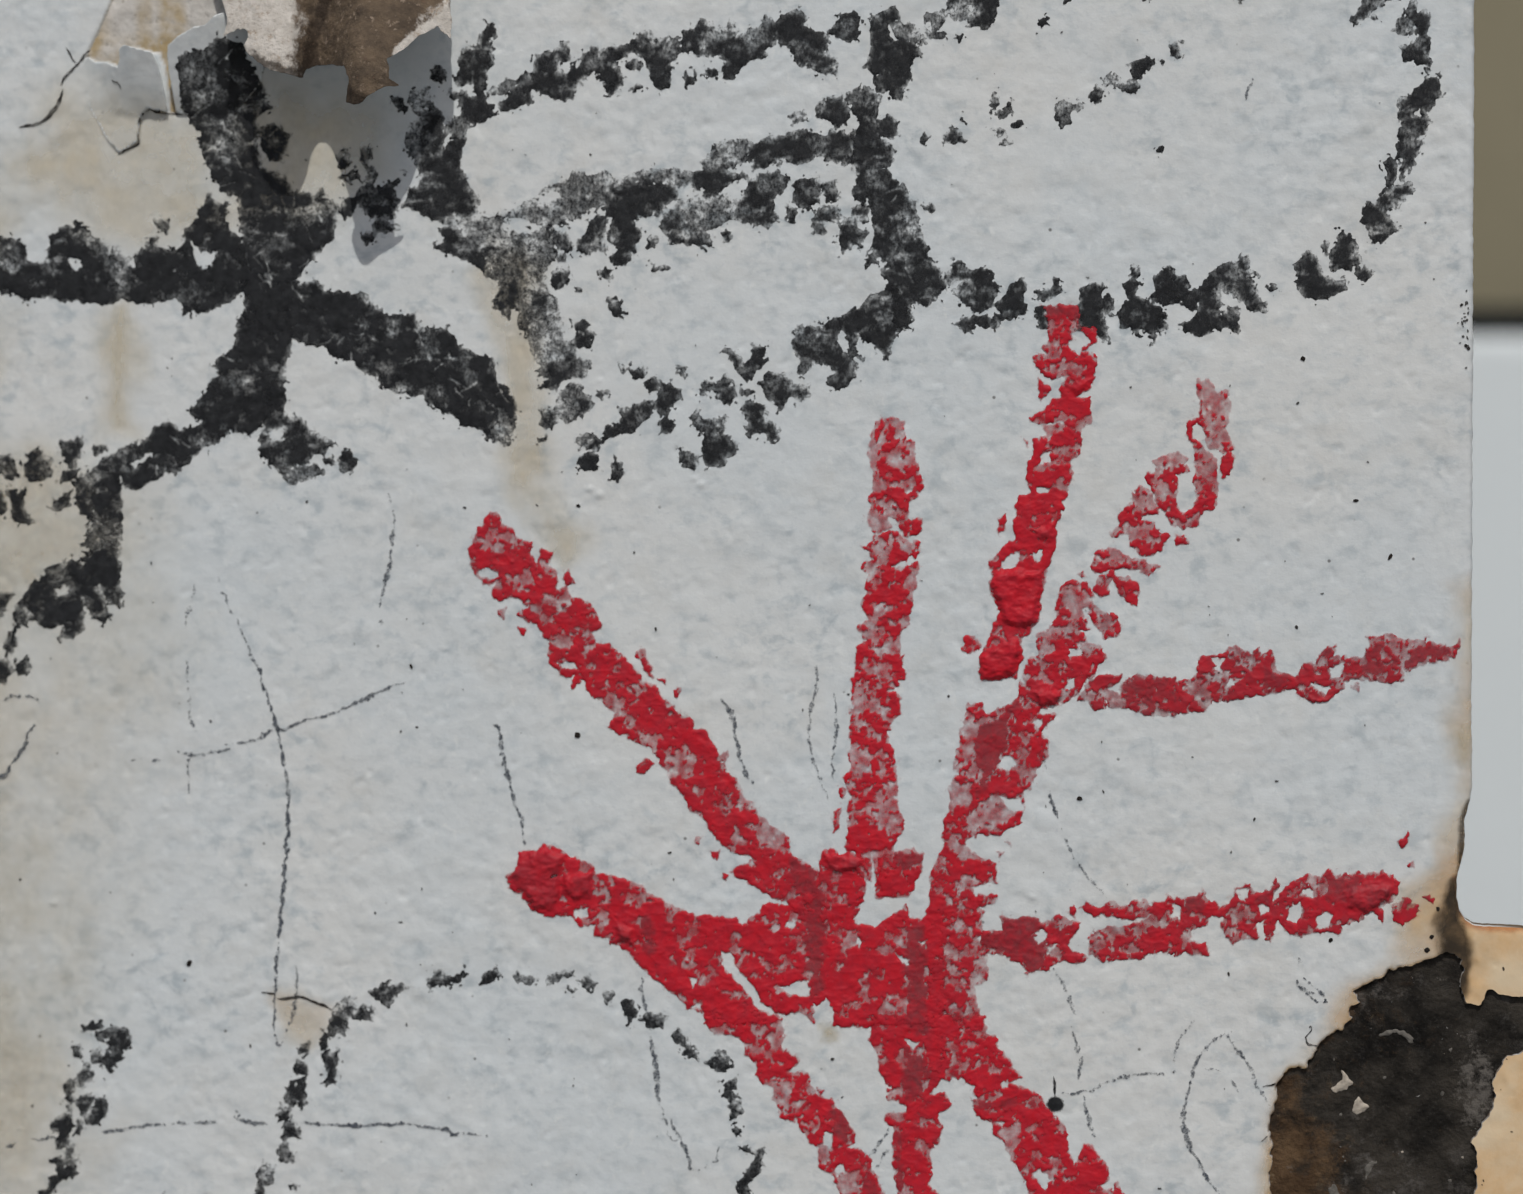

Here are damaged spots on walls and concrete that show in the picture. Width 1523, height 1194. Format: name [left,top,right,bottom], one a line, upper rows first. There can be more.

peeling [79,0,452,152]
crack [261,992,332,1010]
corrosion [1339,995,1359,1025]
corrosion [1407,876,1523,1006]
corrosion [1471,1052,1523,1194]